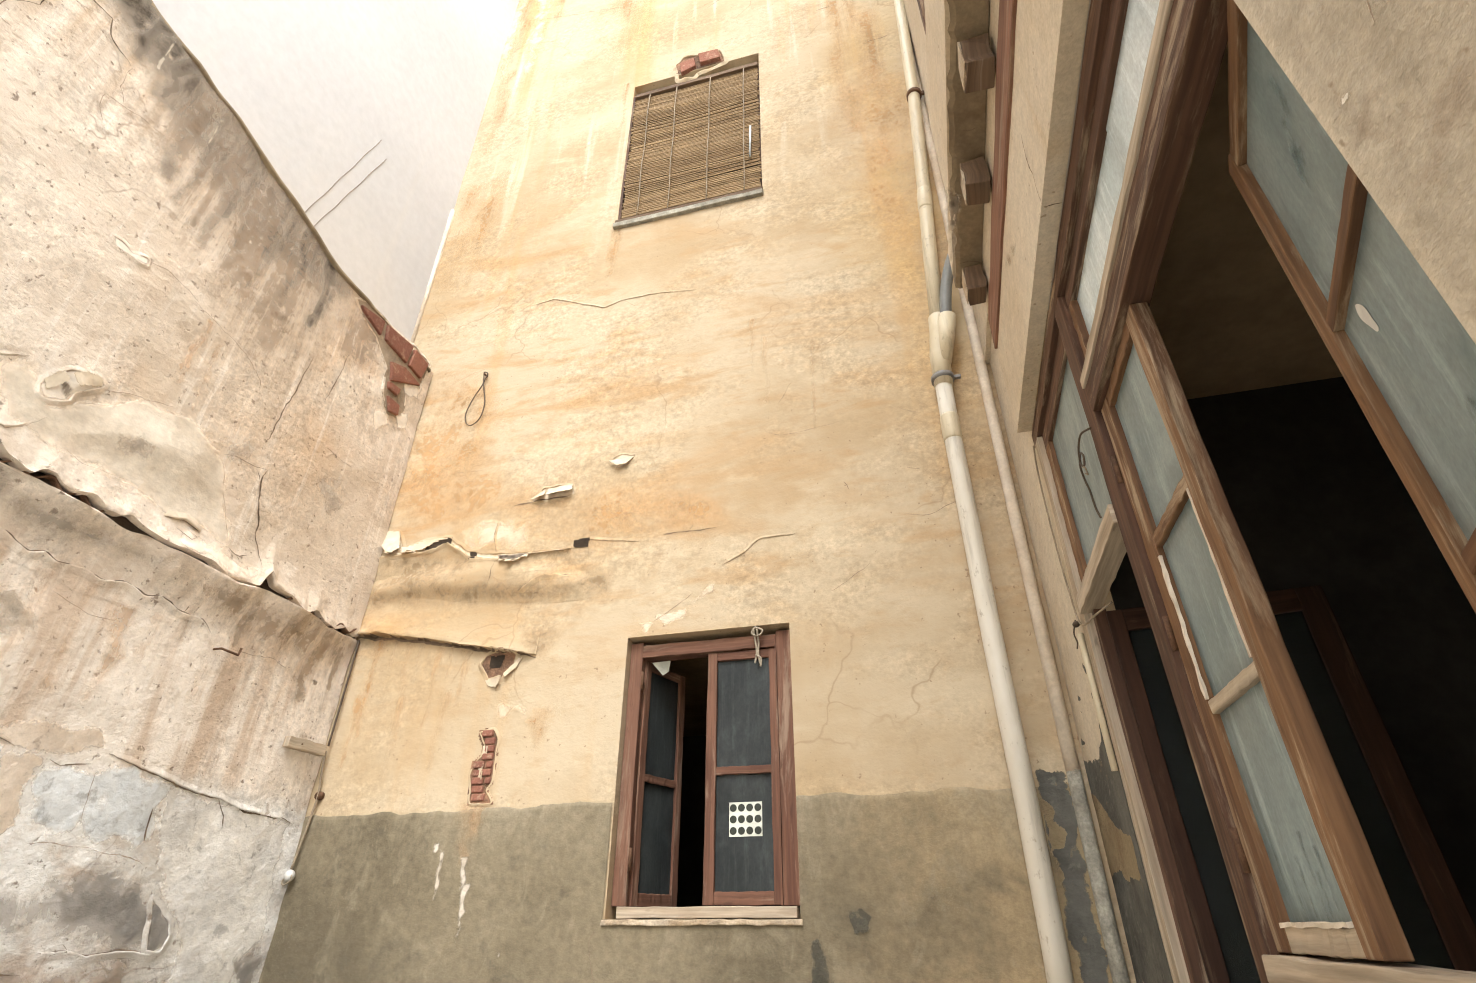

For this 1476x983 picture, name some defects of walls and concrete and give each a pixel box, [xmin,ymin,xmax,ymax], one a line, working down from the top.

crack [0,0,182,143]
flaking render [673,49,728,83]
flaking render [354,297,431,420]
crack [0,527,284,667]
peeling [376,529,590,581]
flaking render [478,646,522,687]
crack [0,733,14,746]
crack [29,748,294,864]
flaking render [467,727,501,807]
peeling [1035,769,1108,983]
peeling [1078,692,1173,983]
water stain [811,939,832,983]